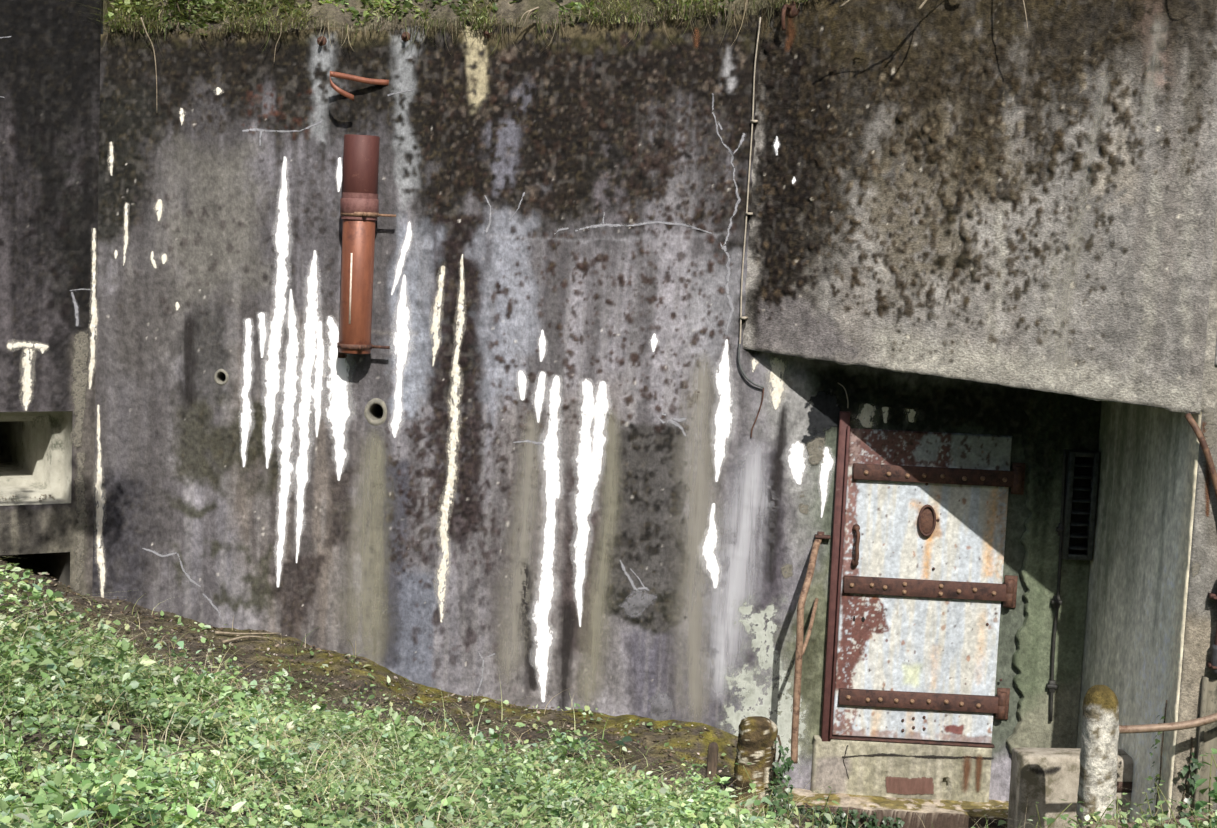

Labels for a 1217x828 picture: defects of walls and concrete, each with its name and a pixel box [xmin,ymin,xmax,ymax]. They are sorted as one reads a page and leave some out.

damp [7,342,48,411]
damp [240,156,350,587]
damp [348,222,412,659]
damp [430,266,445,366]
damp [437,254,465,622]
damp [499,330,618,711]
damp [682,339,806,720]
peeling [720,596,806,765]
damp [819,447,834,518]